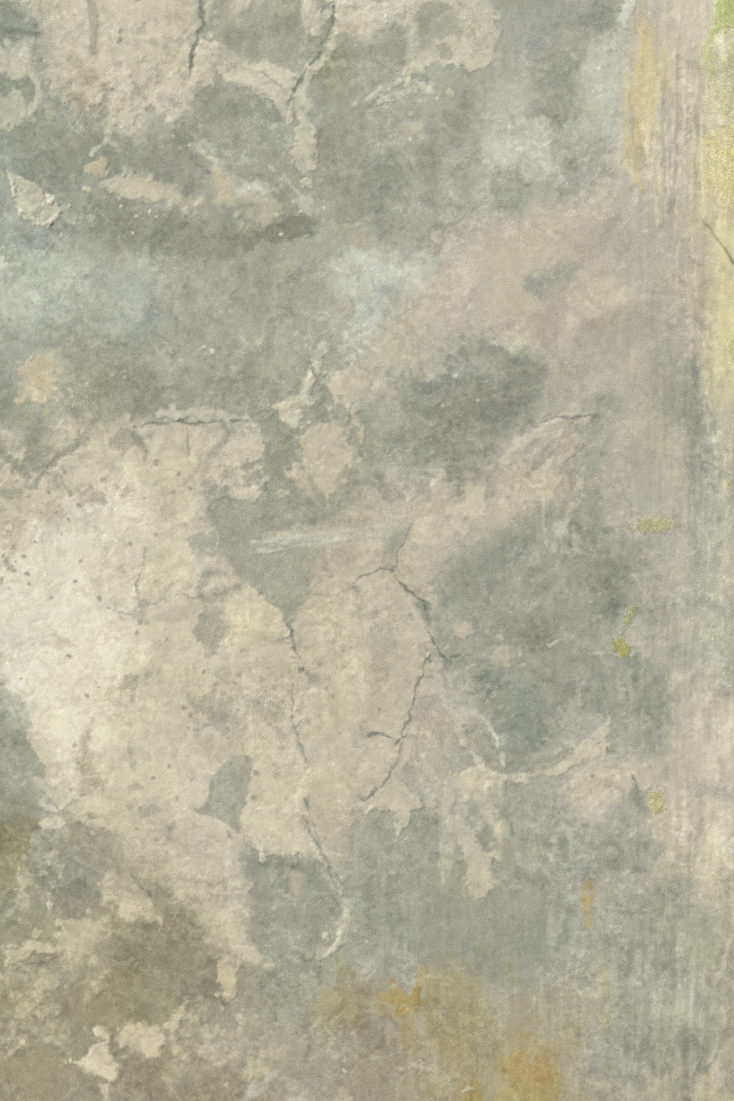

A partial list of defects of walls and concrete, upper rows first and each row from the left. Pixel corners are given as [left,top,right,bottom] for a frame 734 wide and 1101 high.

crack [185,0,338,121]
crack [699,214,734,268]
crack [131,416,253,457]
crack [259,621,311,765]
crack [304,522,472,804]
rust [299,949,583,1101]